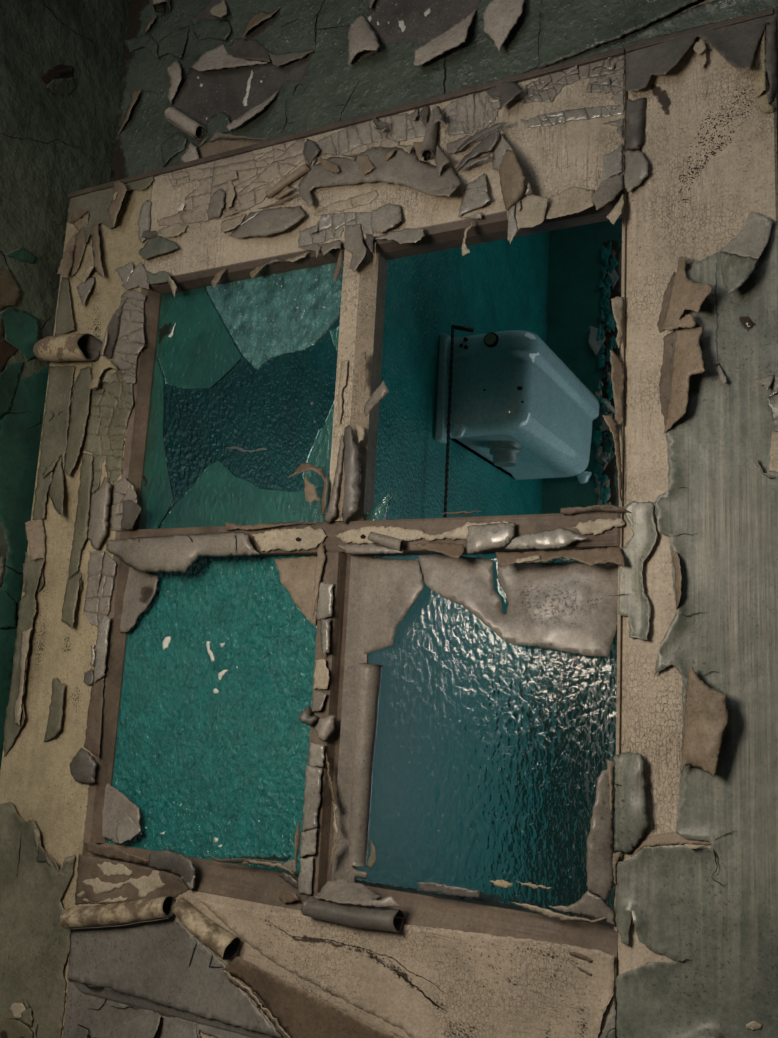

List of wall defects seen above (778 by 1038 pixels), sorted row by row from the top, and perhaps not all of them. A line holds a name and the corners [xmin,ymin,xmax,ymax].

peeling [117,89,141,135]
peeling [209,0,227,18]
spalling [164,7,314,163]
crack [157,0,704,237]
spalling [348,0,525,66]
peeling [537,0,778,113]
peeling [221,81,624,280]
peeling [0,176,178,770]
peeling [60,211,778,1038]
crack [247,915,474,1038]
crack [486,944,617,1038]